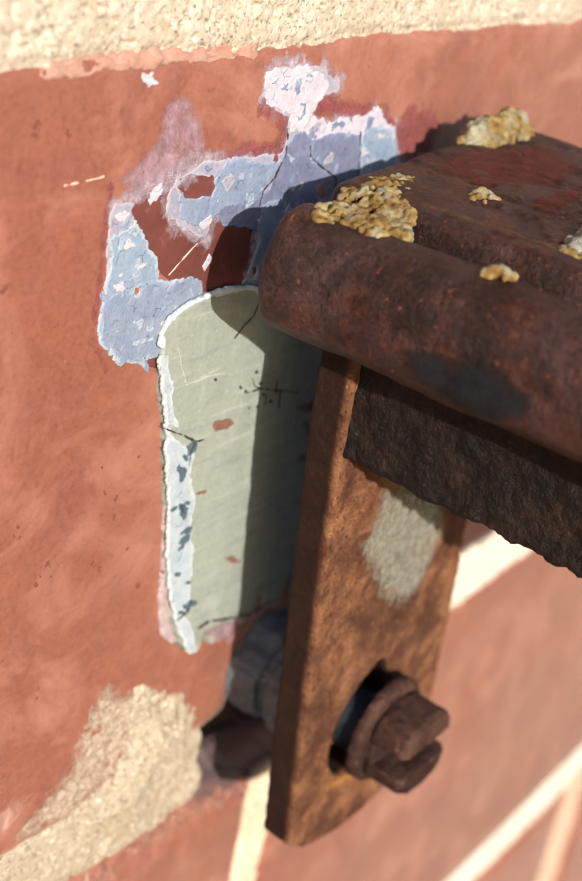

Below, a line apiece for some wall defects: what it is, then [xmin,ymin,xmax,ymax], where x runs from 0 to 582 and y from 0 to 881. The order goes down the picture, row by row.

spalling [40,43,259,87]
peeling [97,64,400,654]
rust [323,773,353,788]